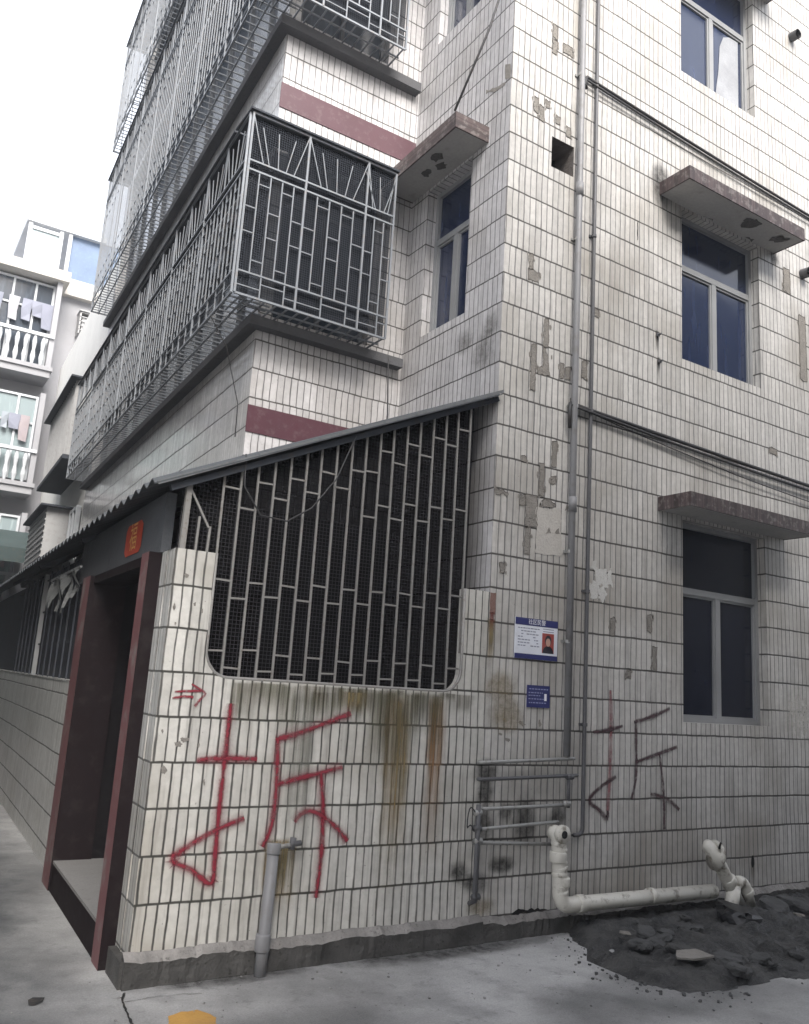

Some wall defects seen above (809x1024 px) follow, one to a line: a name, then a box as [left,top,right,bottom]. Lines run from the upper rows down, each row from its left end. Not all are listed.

spalling [551,22,575,58]
spalling [532,96,572,140]
peeling [421,153,447,177]
peeling [740,218,762,242]
spalling [527,252,541,283]
spalling [529,318,589,391]
spalling [797,314,807,382]
peeling [494,441,568,557]
peeling [589,561,613,603]
corrosion [428,702,442,784]